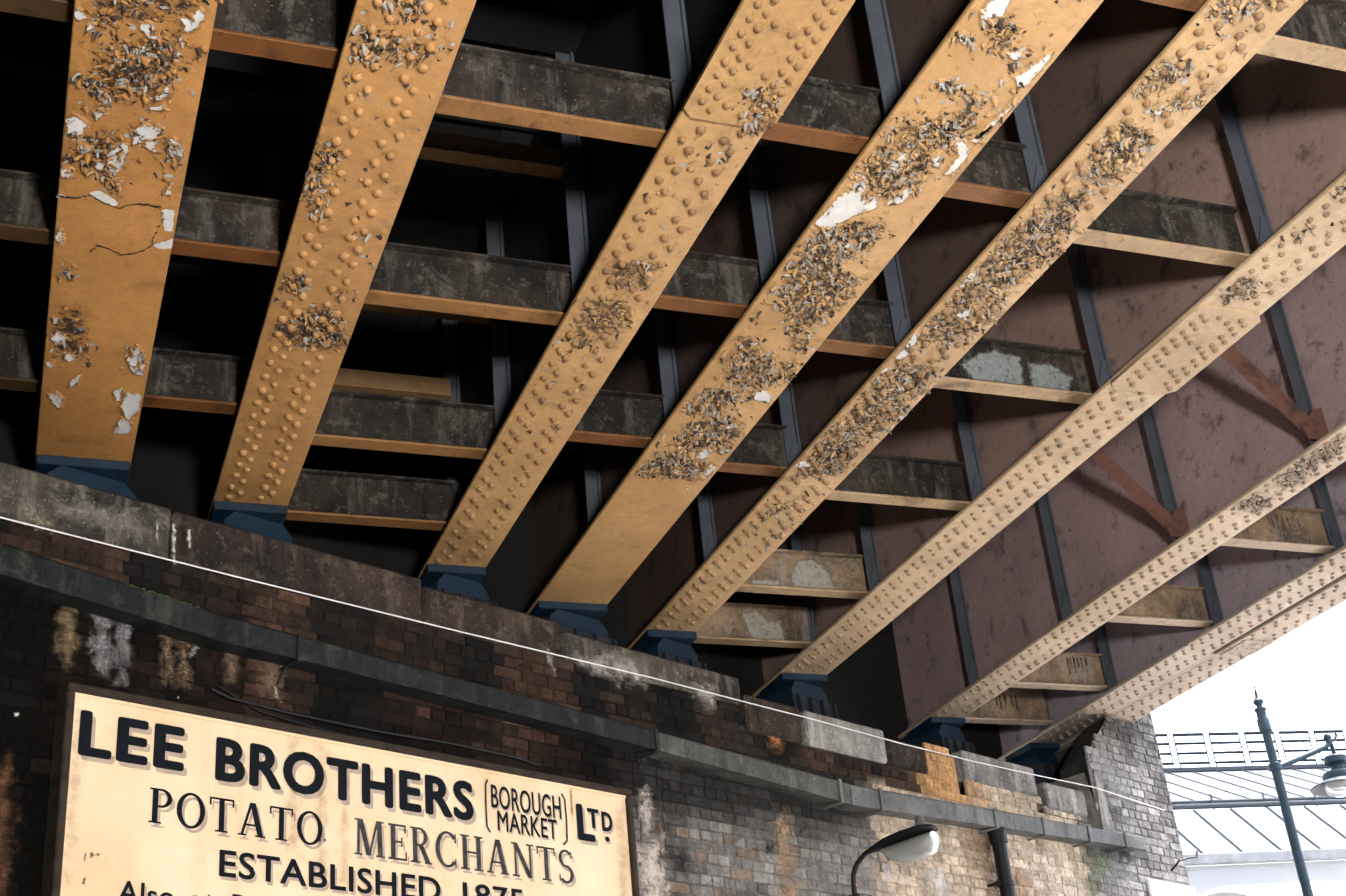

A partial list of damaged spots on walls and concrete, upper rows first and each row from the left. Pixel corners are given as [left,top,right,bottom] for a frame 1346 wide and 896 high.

peeling [60,0,224,199]
peeling [344,0,455,97]
peeling [44,304,99,410]
crack [56,191,175,255]
peeling [111,343,149,435]
peeling [269,273,359,354]
peeling [299,142,383,268]
peeling [535,191,683,393]
peeling [635,0,1057,490]
peeling [733,0,1308,553]
peeling [1233,432,1346,514]
water stain [93,615,130,670]